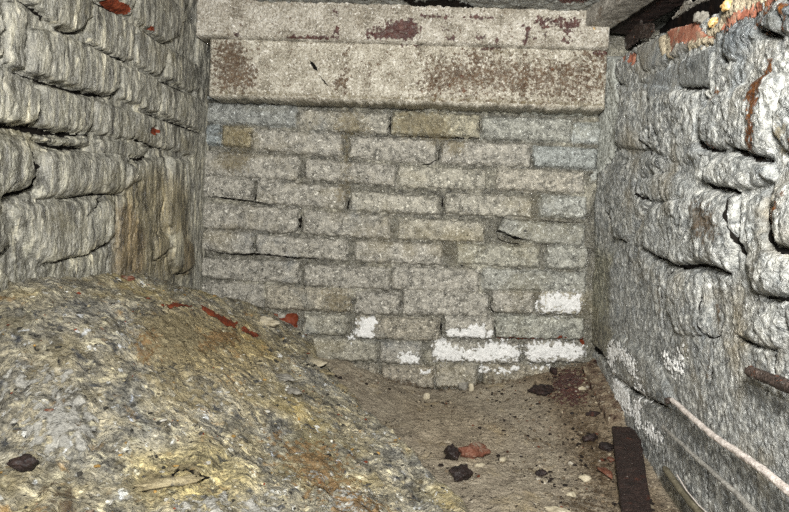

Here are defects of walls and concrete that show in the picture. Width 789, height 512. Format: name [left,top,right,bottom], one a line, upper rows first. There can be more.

spalling [99,0,131,15]
corrosion [332,43,350,95]
corrosion [365,13,607,105]
corrosion [744,50,773,151]
crack [496,230,526,245]
leakage [535,288,586,319]
leakage [348,315,378,345]
leakage [397,323,588,387]